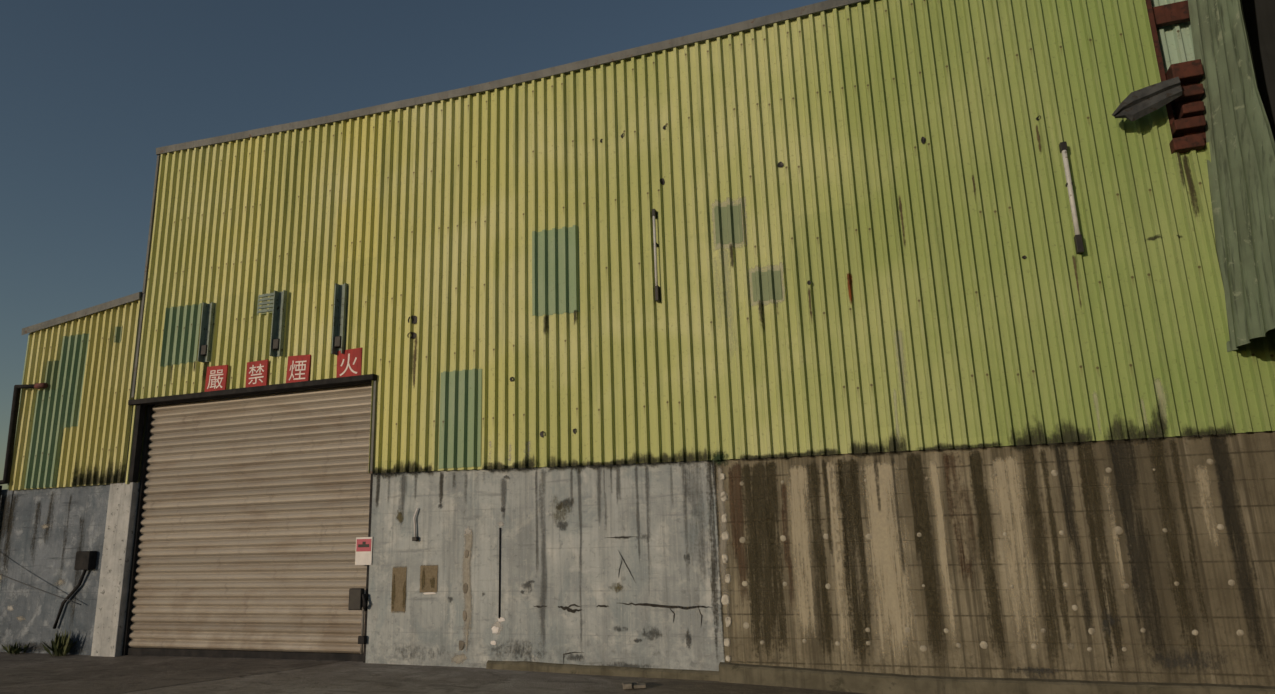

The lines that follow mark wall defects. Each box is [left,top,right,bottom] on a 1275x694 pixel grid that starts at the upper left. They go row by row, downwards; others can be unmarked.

leakage [372,462,466,522]
leakage [483,442,724,647]
leakage [740,392,1268,674]